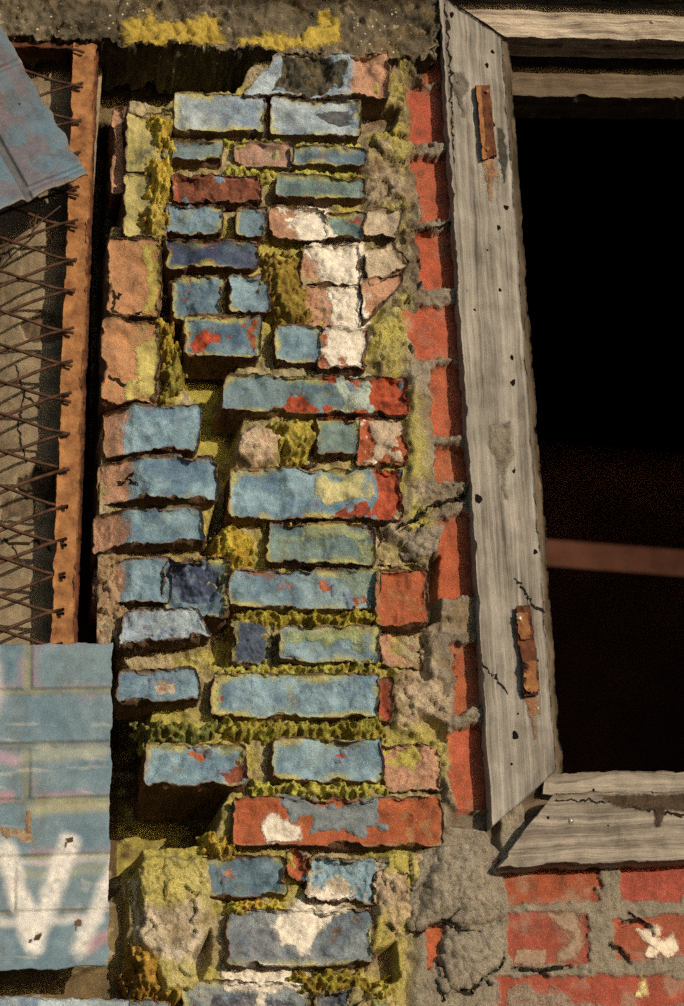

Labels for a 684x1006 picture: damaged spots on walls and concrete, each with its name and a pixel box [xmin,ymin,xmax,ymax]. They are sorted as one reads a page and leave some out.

corrosion [483,157,499,200]
spalling [188,324,221,354]
spalling [246,311,259,355]
spalling [270,373,410,529]
crack [514,578,545,614]
peeling [279,793,389,839]